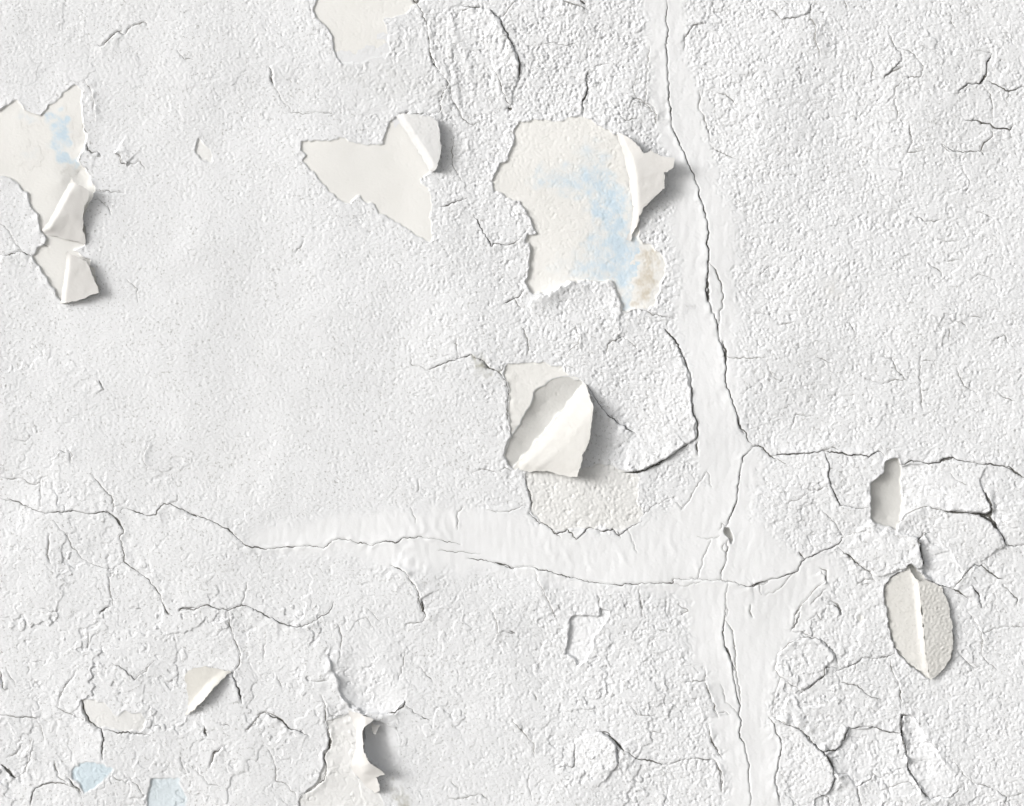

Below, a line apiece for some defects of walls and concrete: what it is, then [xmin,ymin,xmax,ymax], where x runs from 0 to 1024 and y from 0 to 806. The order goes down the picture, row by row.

peeling [0,84,101,305]
peeling [492,115,675,312]
crack [853,36,1023,217]
crack [1,672,161,804]
crack [2,474,333,704]
flaking render [298,629,413,806]
peeling [503,361,644,532]
crack [309,0,883,804]
flaking render [870,458,903,531]
crack [769,565,1024,806]
peeling [883,532,963,680]
crack [900,457,1024,547]